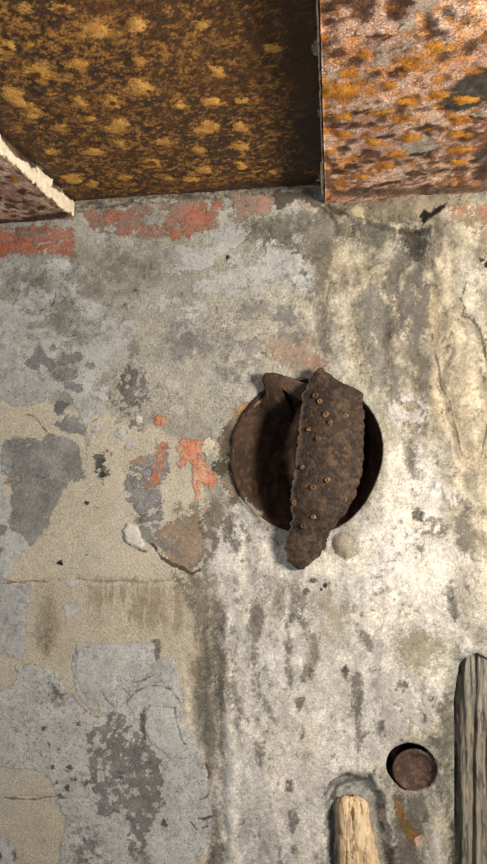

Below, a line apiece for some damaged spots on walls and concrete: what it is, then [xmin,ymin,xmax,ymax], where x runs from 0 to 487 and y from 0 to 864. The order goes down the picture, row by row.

rust [50,3,115,40]
rust [1,87,42,119]
rust [70,94,130,147]
rust [228,121,249,170]
rust [328,69,487,187]
crack [460,287,487,360]
crack [432,334,461,451]
peeling [0,185,487,864]
water stain [270,582,357,683]
water stain [447,587,460,620]
water stain [322,628,459,864]
water stain [288,811,300,834]